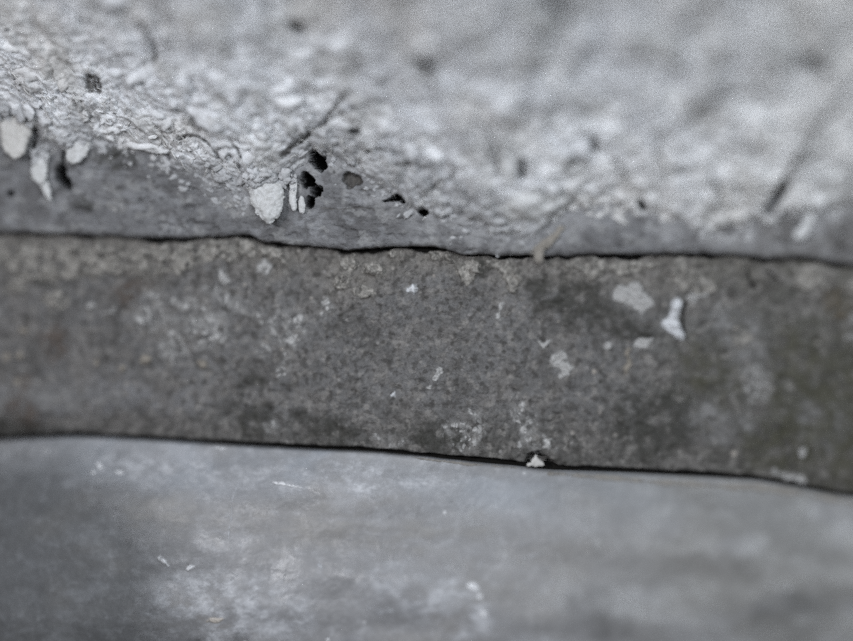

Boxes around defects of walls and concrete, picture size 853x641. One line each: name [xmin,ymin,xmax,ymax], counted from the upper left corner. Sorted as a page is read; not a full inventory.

peeling [0,102,92,200]
peeling [241,150,328,225]
crack [0,231,853,289]
peeling [530,225,566,263]
peeling [790,195,826,240]
crack [0,431,853,495]